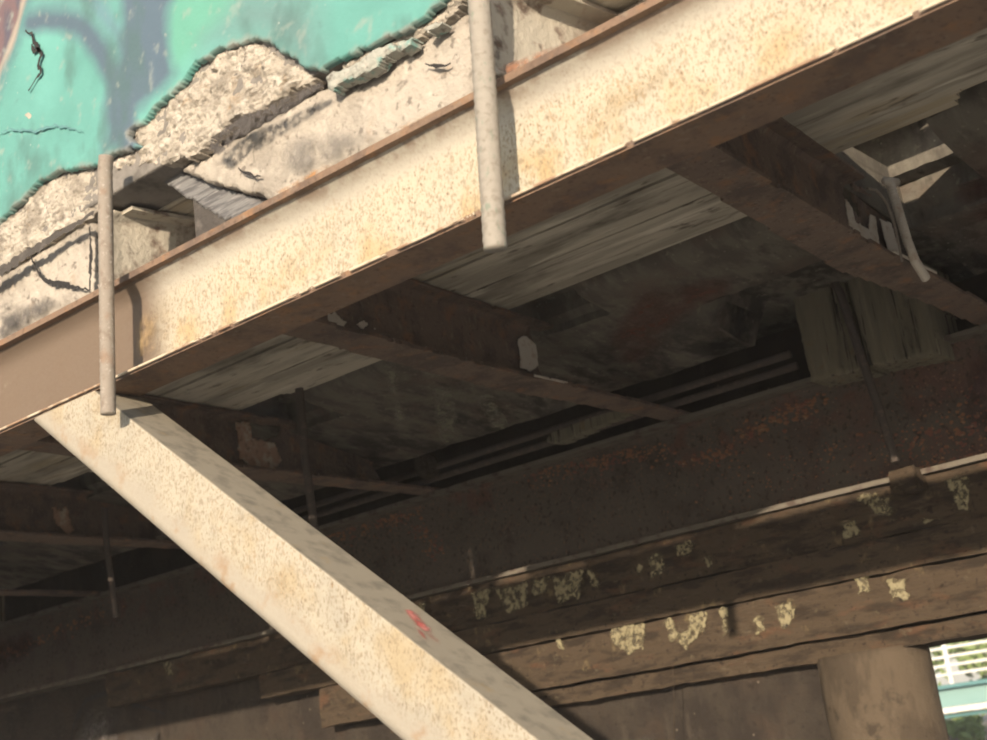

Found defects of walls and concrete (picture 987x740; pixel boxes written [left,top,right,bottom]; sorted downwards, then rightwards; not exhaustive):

spalling [113,0,468,170]
crack [0,211,94,291]
spalling [0,169,98,274]
peeling [845,199,910,261]
peeling [517,336,568,383]
peeling [235,421,282,468]